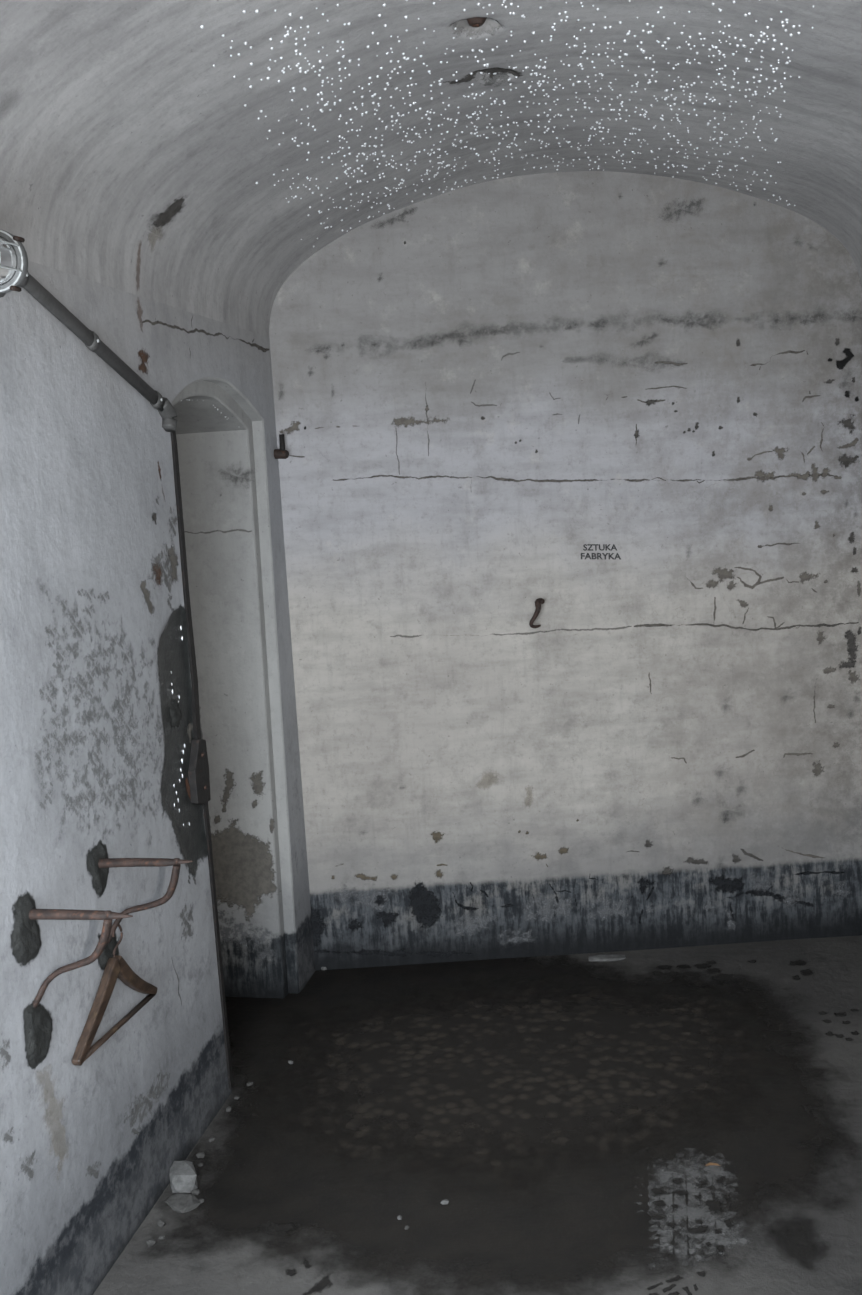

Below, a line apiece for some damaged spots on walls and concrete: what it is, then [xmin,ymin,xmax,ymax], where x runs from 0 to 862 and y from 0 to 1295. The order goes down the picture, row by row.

crack [143,316,269,355]
spalling [393,396,448,456]
crack [334,386,835,483]
crack [757,543,828,592]
crack [494,617,859,636]
peeling [140,498,277,921]
peeling [180,905,193,938]
leakage [157,902,857,1295]